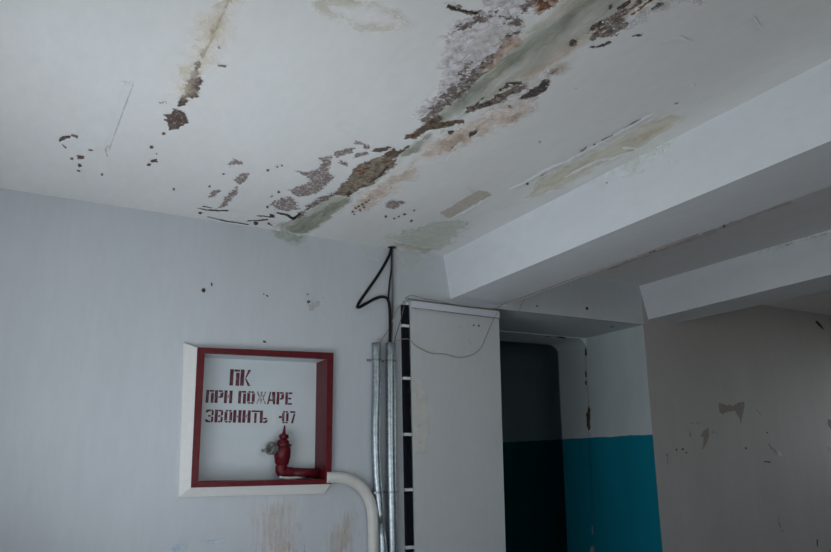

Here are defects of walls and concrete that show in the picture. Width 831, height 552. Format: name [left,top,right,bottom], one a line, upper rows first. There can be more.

crack [182,0,230,91]
damp [439,0,628,129]
spalling [588,0,664,48]
spalling [198,0,563,226]
damp [535,118,674,195]
damp [279,196,349,233]